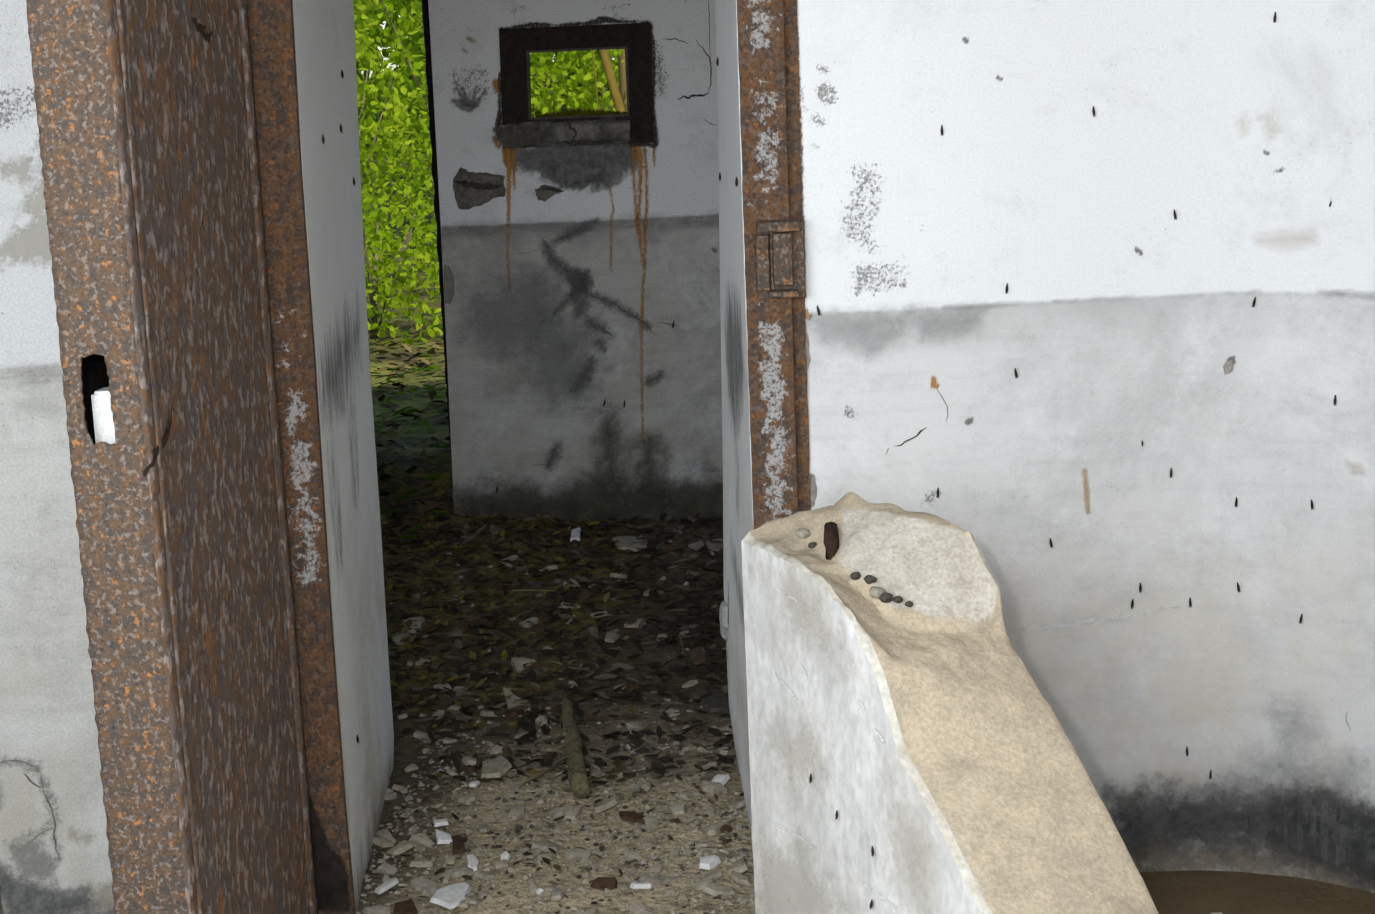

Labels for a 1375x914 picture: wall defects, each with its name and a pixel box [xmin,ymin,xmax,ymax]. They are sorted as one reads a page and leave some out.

peeling [0,147,51,260]
corrosion [492,117,516,289]
spalling [453,144,638,210]
damp [543,220,648,393]
corrosion [631,146,656,441]
damp [727,297,743,422]
crack [0,760,60,858]
damp [1103,786,1375,894]